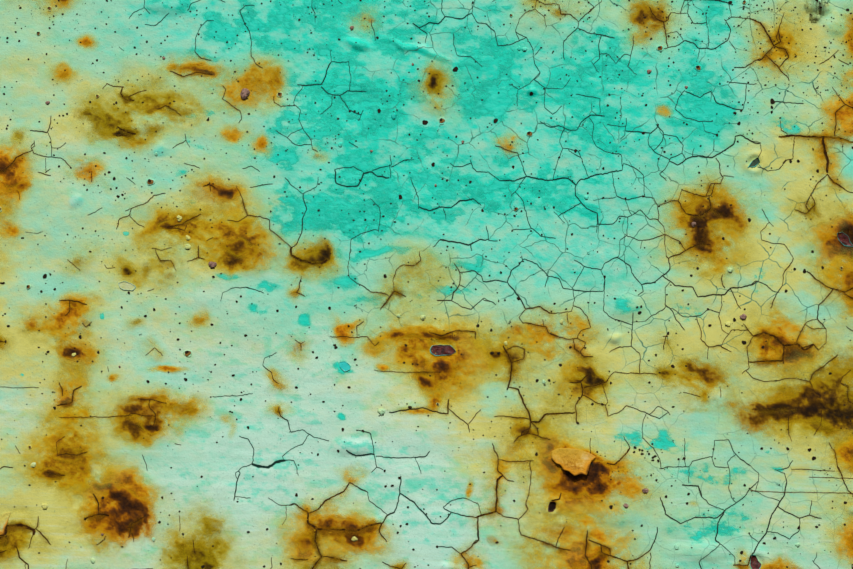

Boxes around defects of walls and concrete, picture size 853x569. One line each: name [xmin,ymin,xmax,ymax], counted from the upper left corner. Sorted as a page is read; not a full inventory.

crack [0,117,71,176]
corrosion [117,175,276,287]
crack [229,0,853,569]
peeling [0,512,11,535]
crack [0,516,51,569]
corrosion [23,294,158,552]
crack [46,383,164,477]
peeling [430,345,456,356]
corrosion [364,316,609,414]
corrosion [491,414,647,569]
peeling [551,448,596,476]
corrosion [730,309,853,473]